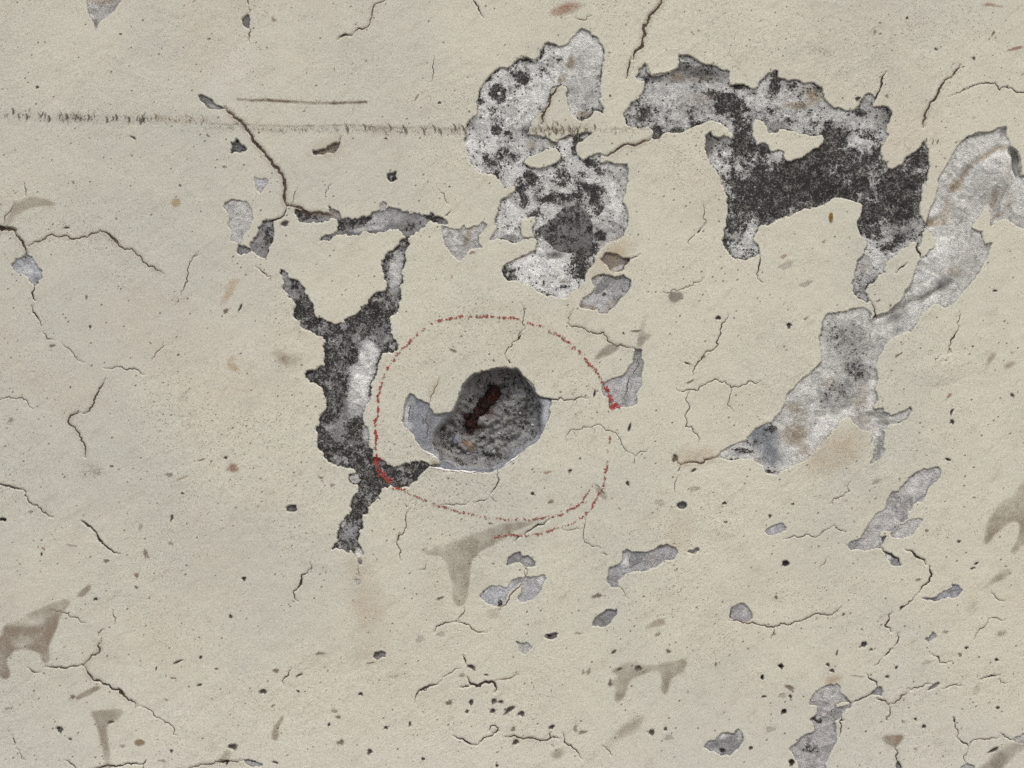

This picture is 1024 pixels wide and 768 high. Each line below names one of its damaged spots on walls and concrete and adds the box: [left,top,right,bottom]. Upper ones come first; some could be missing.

crack [225,108,331,221]
crack [0,183,160,271]
peeling [224,29,631,565]
peeling [623,48,1024,475]
crack [67,345,164,457]
crack [674,317,760,493]
crack [82,521,116,553]
peeling [480,552,546,607]
peeling [592,544,699,598]
peeling [848,458,951,566]
crack [839,547,1004,737]
peeling [789,650,851,768]